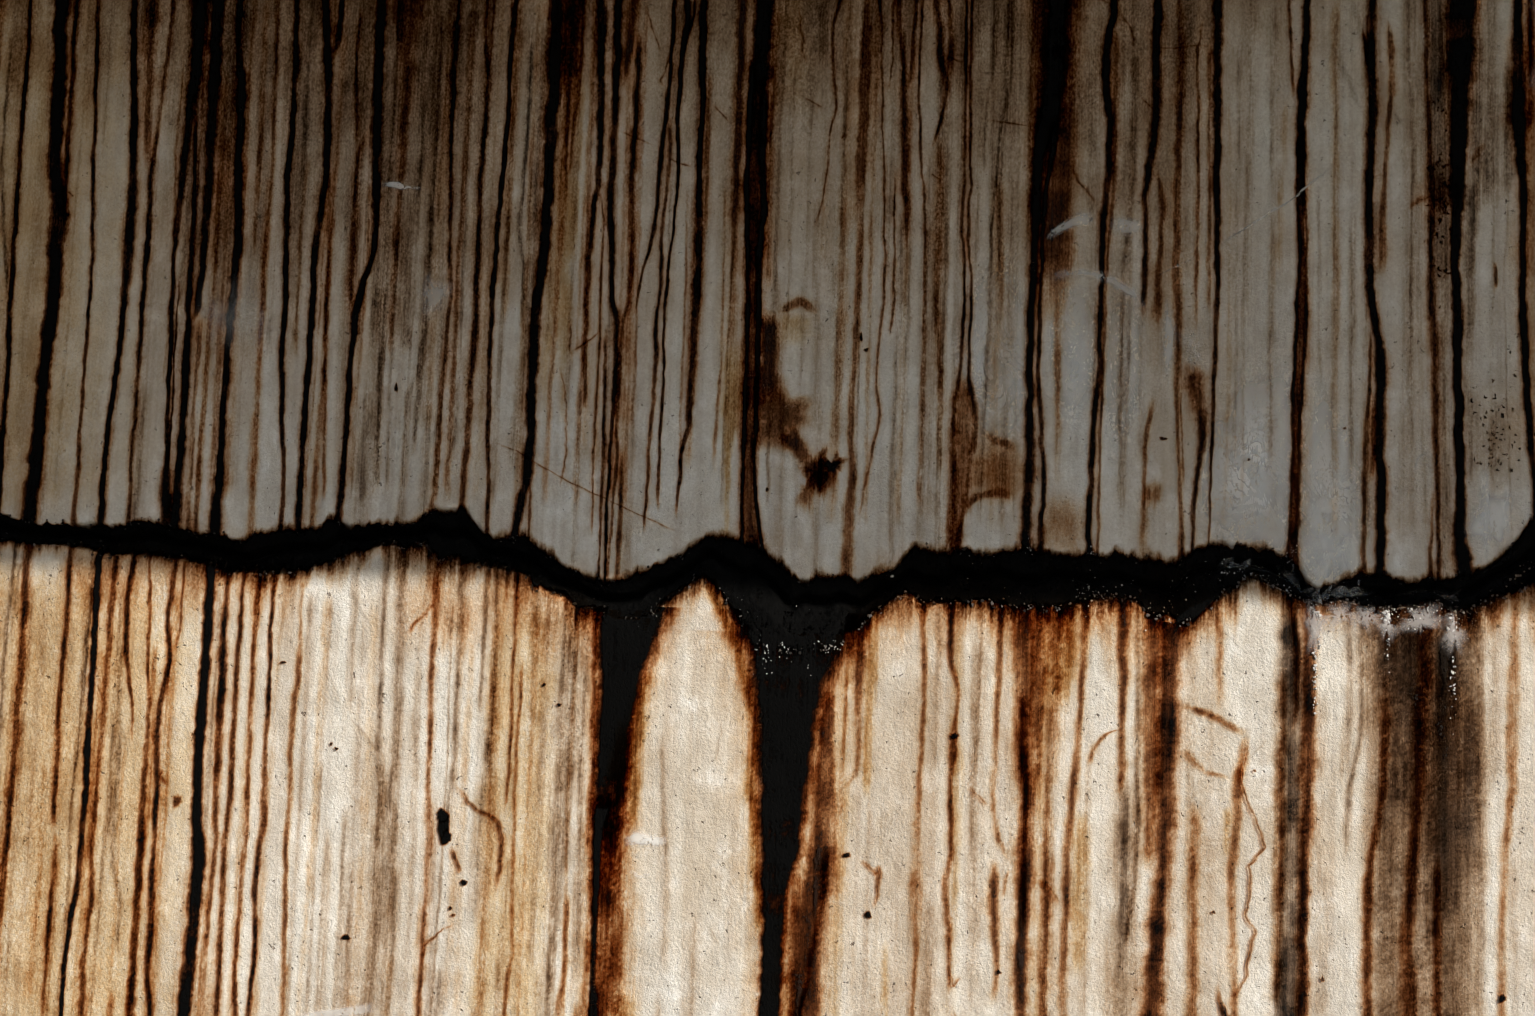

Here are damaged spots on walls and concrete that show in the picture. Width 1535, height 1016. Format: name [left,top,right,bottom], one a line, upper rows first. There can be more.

corrosion [622,0,639,79]
leakage [0,0,187,1016]
leakage [97,0,711,585]
leakage [739,0,780,552]
crack [0,325,1535,719]
corrosion [724,0,872,583]
corrosion [967,0,1081,552]
leakage [177,565,280,1016]
leakage [417,556,463,1016]
leakage [553,606,679,1016]
leakage [707,578,874,1016]
crack [1187,707,1266,1016]